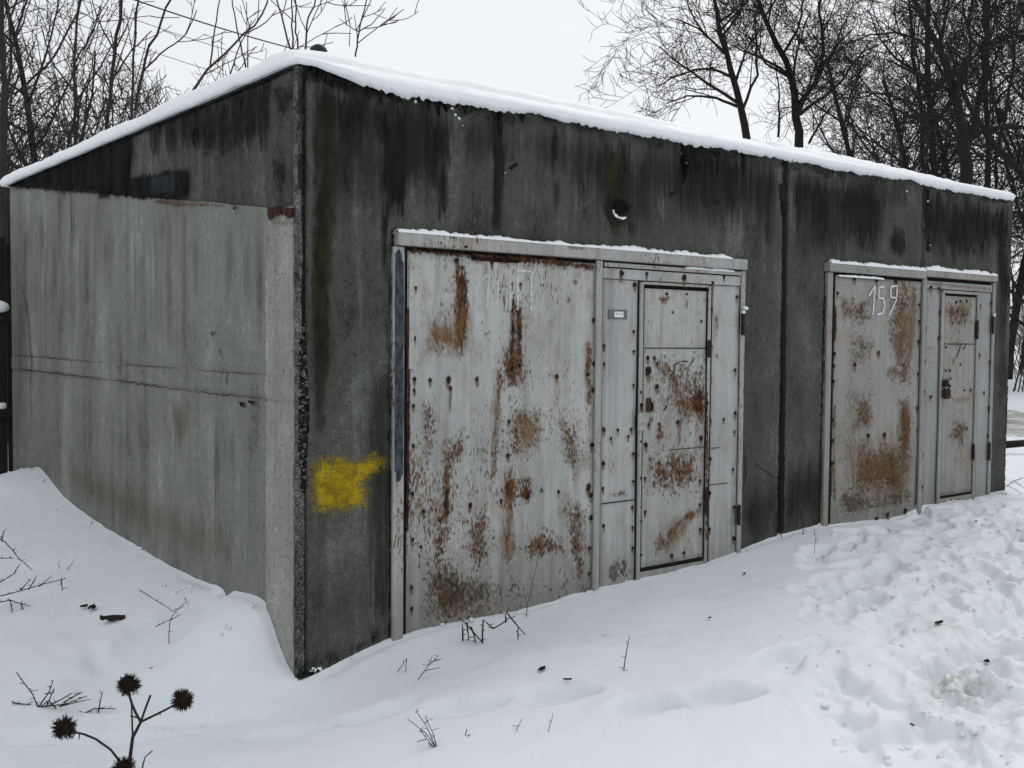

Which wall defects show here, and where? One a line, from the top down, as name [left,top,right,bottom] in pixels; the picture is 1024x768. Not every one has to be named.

water stain [148,83,267,160]
corrosion [267,206,295,221]
water stain [298,67,451,425]
water stain [472,112,505,228]
water stain [552,131,774,232]
water stain [889,227,906,257]
water stain [929,198,1010,322]
corrosion [406,237,737,628]
corrosion [831,278,992,522]